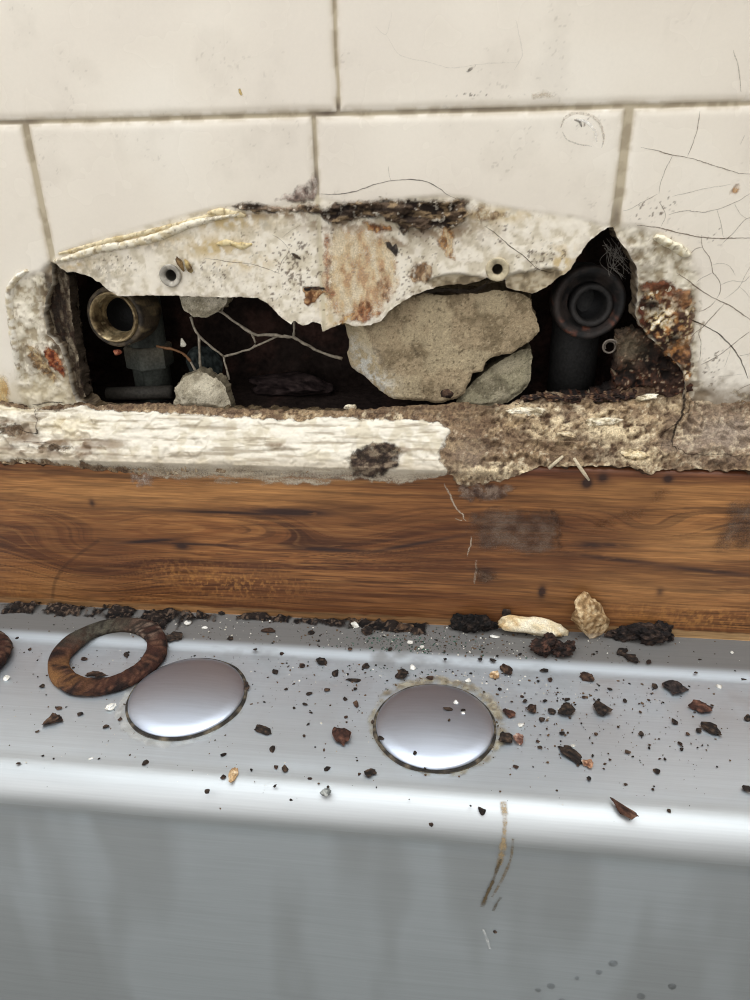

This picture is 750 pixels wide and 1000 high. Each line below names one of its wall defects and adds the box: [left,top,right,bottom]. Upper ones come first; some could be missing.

crack [646,114,743,174]
rust [27,345,65,382]
spalling [77,273,144,404]
spalling [156,296,457,410]
spalling [303,287,326,306]
rust [324,222,396,323]
rust [408,262,432,283]
rust [438,226,454,258]
spalling [503,227,693,417]
rust [637,280,695,381]
crack [637,202,750,387]
spalling [350,442,399,478]